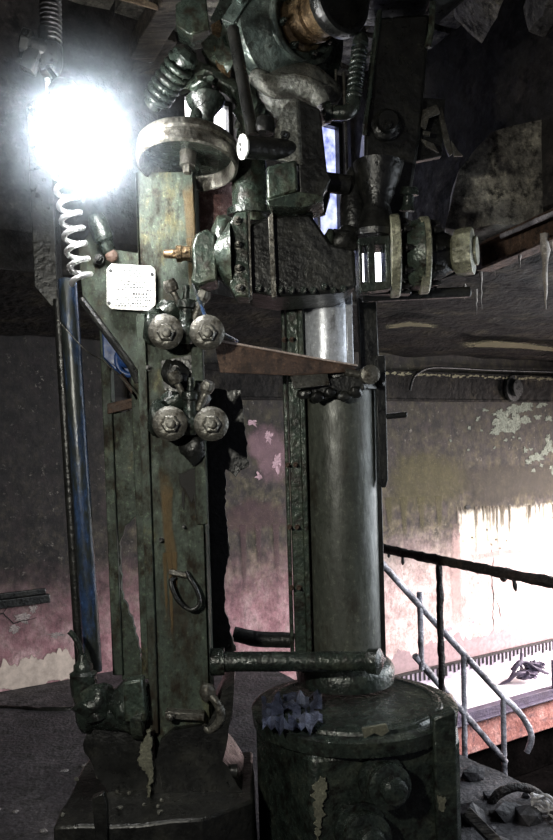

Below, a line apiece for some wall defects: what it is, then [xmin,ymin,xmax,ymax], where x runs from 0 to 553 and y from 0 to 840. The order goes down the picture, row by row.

peeling [467,402,553,475]
damp [471,465,553,557]
spalling [9,605,38,634]
spalling [0,648,75,690]